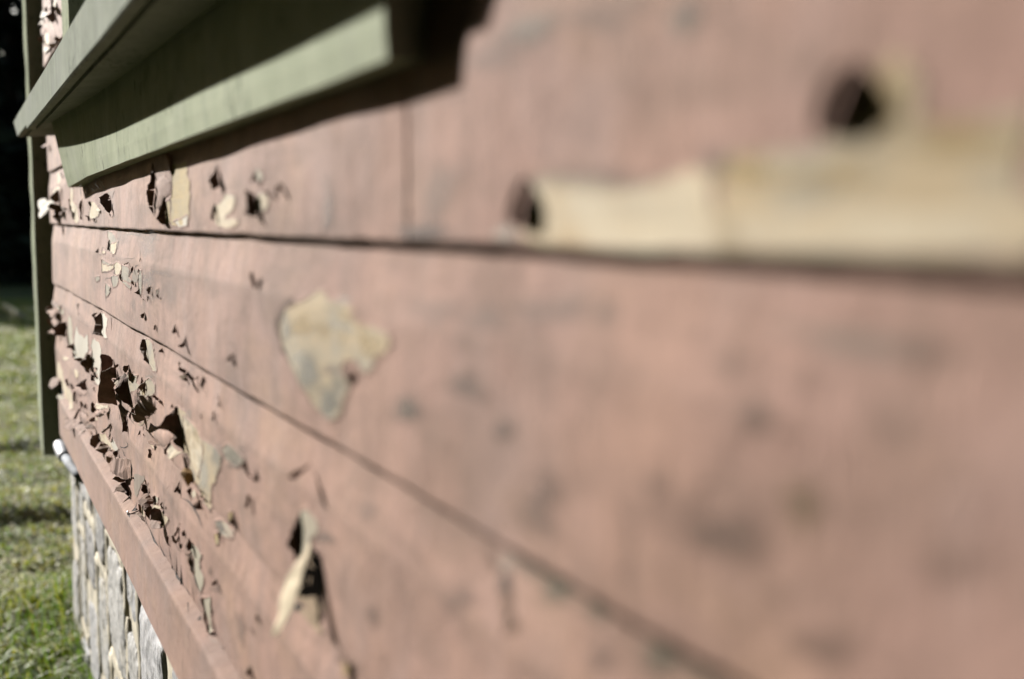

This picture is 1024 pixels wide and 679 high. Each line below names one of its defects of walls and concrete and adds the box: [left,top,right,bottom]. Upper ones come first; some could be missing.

peeling [38,171,114,225]
peeling [146,153,191,230]
peeling [208,164,282,231]
peeling [507,52,1024,258]
peeling [274,286,393,425]
peeling [45,230,251,647]
peeling [271,505,331,636]